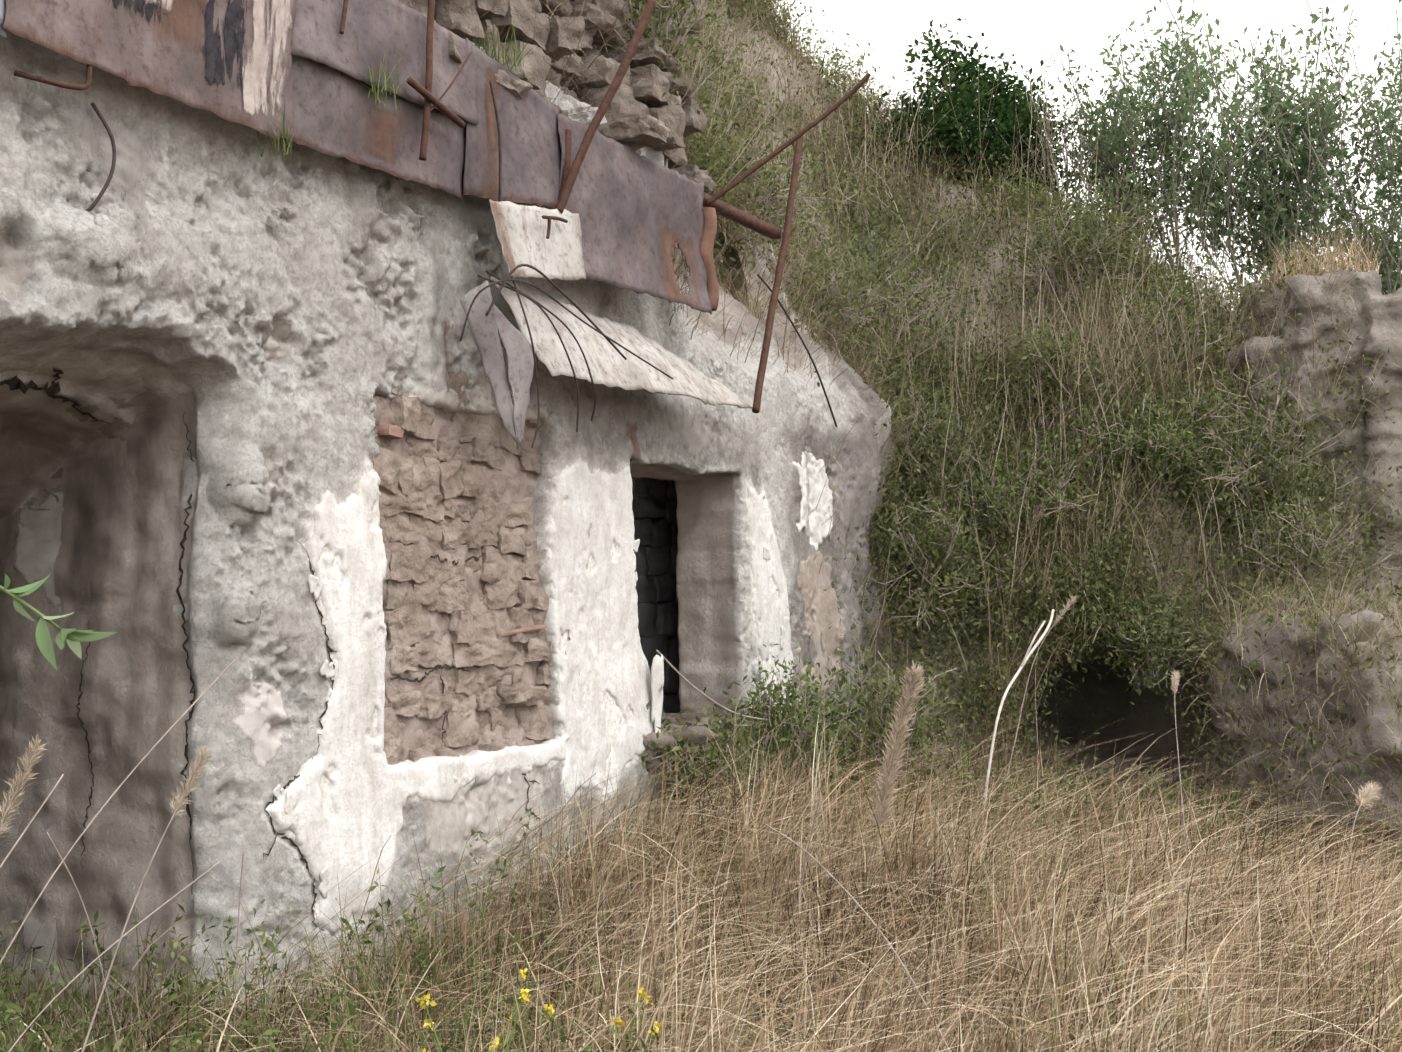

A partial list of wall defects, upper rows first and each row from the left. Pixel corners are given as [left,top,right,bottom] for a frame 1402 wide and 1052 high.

crack [0,367,110,426]
spalling [408,377,552,438]
crack [176,410,195,909]
flaking render [264,457,664,939]